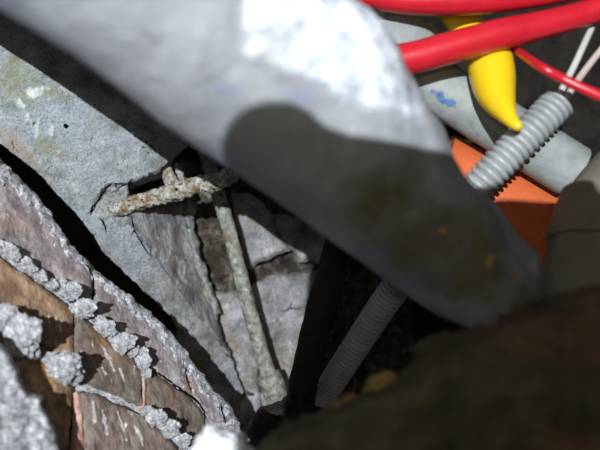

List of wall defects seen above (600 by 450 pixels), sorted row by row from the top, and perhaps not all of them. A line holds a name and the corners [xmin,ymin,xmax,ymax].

crack [88,182,131,235]
spalling [93,156,239,227]